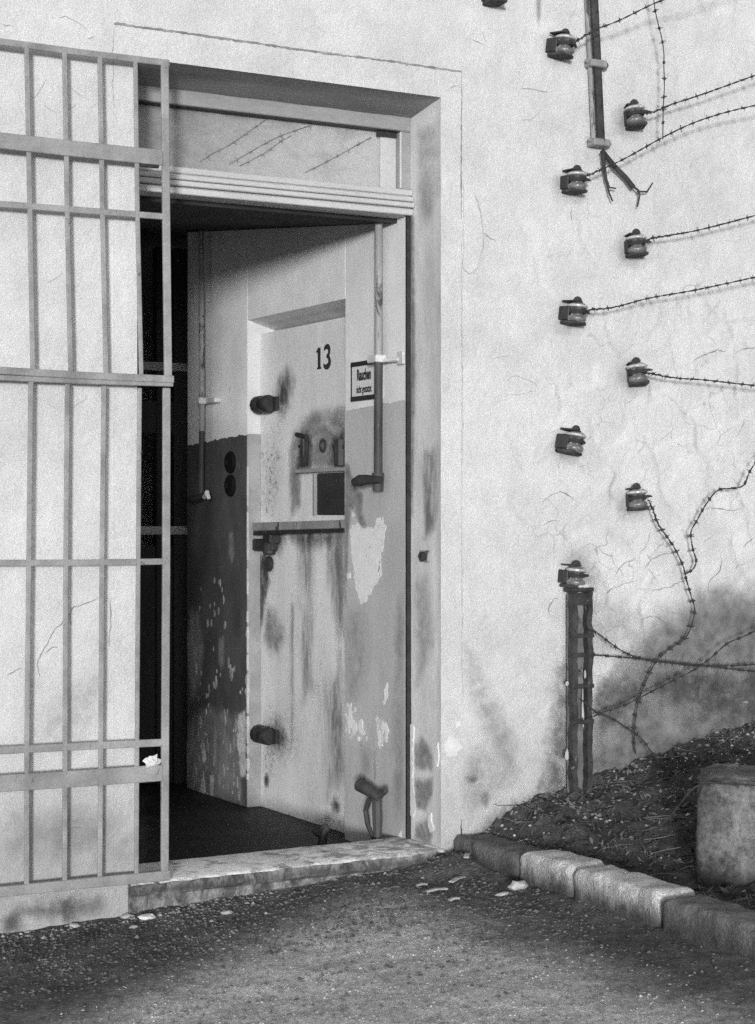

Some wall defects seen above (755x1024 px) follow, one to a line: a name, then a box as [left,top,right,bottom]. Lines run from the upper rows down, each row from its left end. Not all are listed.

crack [59,15,495,701]
crack [6,598,111,676]
water stain [298,533,343,627]
peeling [345,467,387,605]
crack [605,552,722,630]
peeling [188,577,250,802]
water stain [332,698,340,773]
peeling [345,702,389,748]
water stain [593,596,755,773]